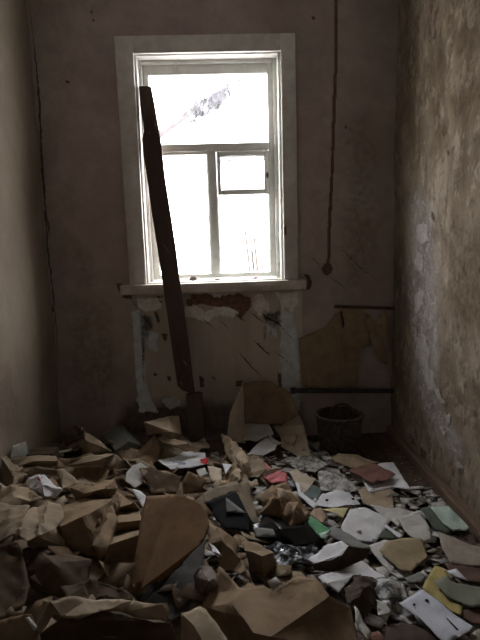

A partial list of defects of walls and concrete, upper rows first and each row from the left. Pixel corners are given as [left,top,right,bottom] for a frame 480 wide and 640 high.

crack [29,5,58,375]
peeling [116,283,168,413]
peeling [184,290,301,410]
peeling [408,193,454,441]